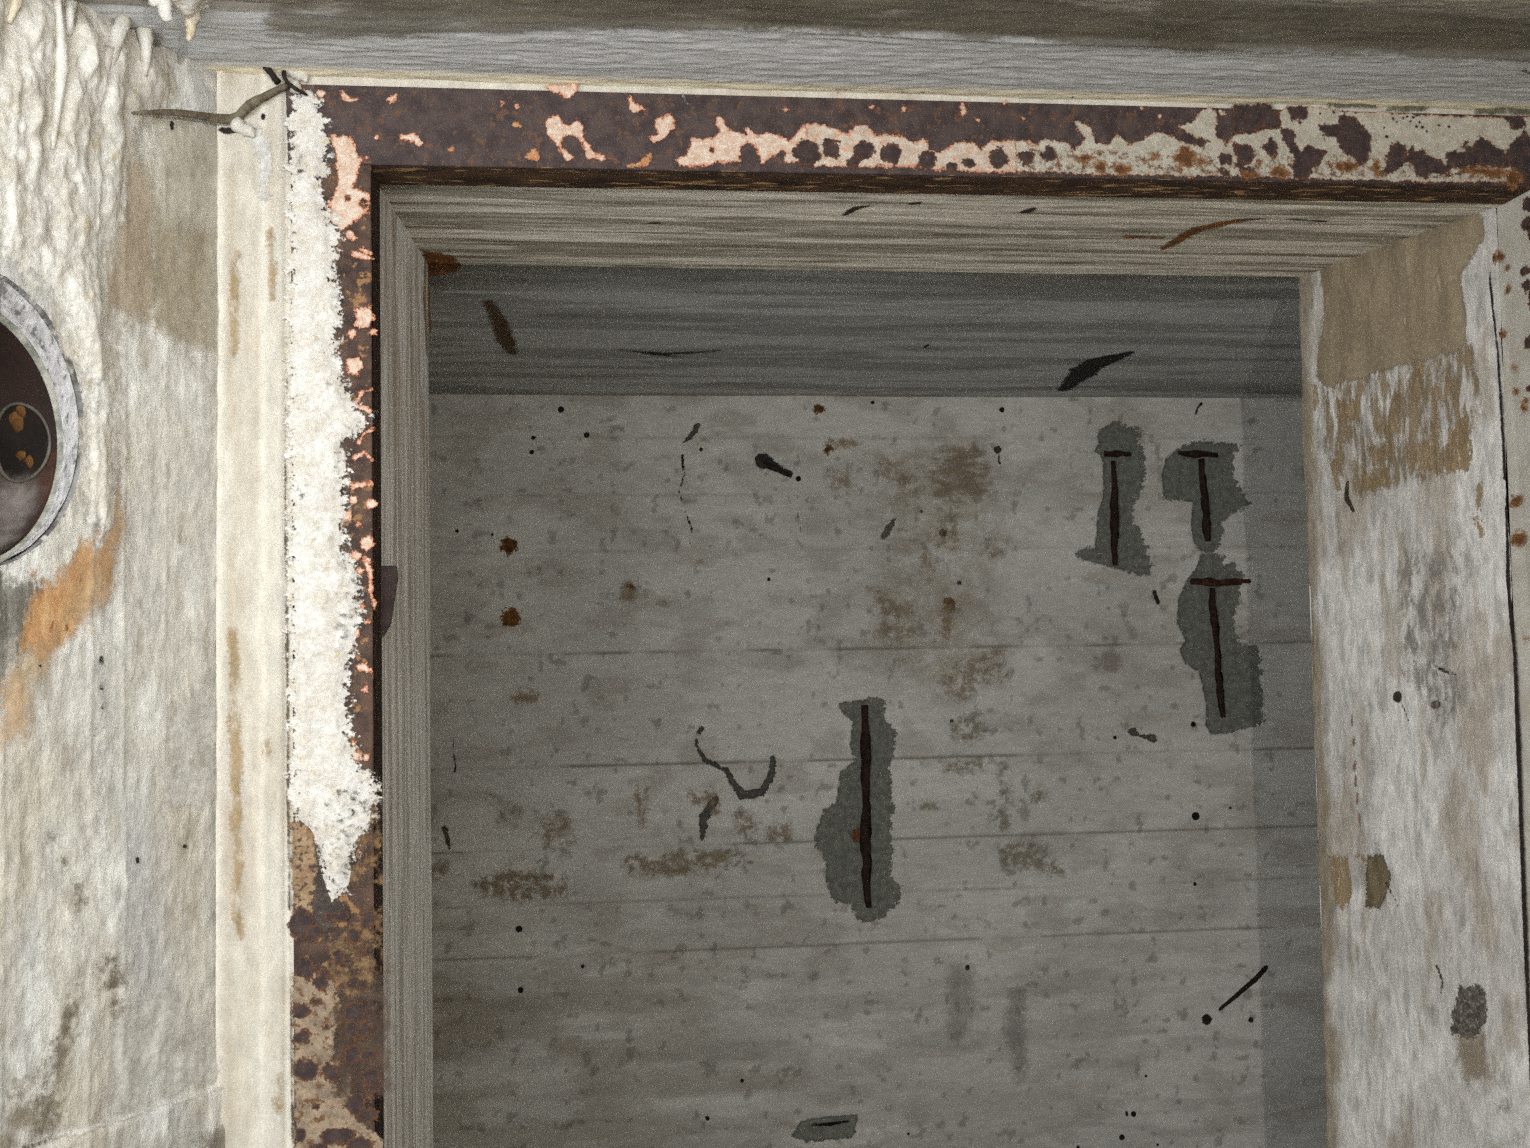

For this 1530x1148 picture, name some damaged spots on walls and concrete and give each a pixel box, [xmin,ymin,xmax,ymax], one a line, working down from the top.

water stain [0,0,177,565]
peeling [675,105,1530,184]
rust [1016,102,1530,241]
peeling [1312,213,1485,538]
water stain [0,572,38,689]
rust [0,493,123,739]
water stain [218,70,382,940]
spalling [1075,421,1266,735]
rust [1489,250,1530,1076]
spalling [813,696,903,923]
rust [278,905,381,1148]
water stain [332,968,392,1102]